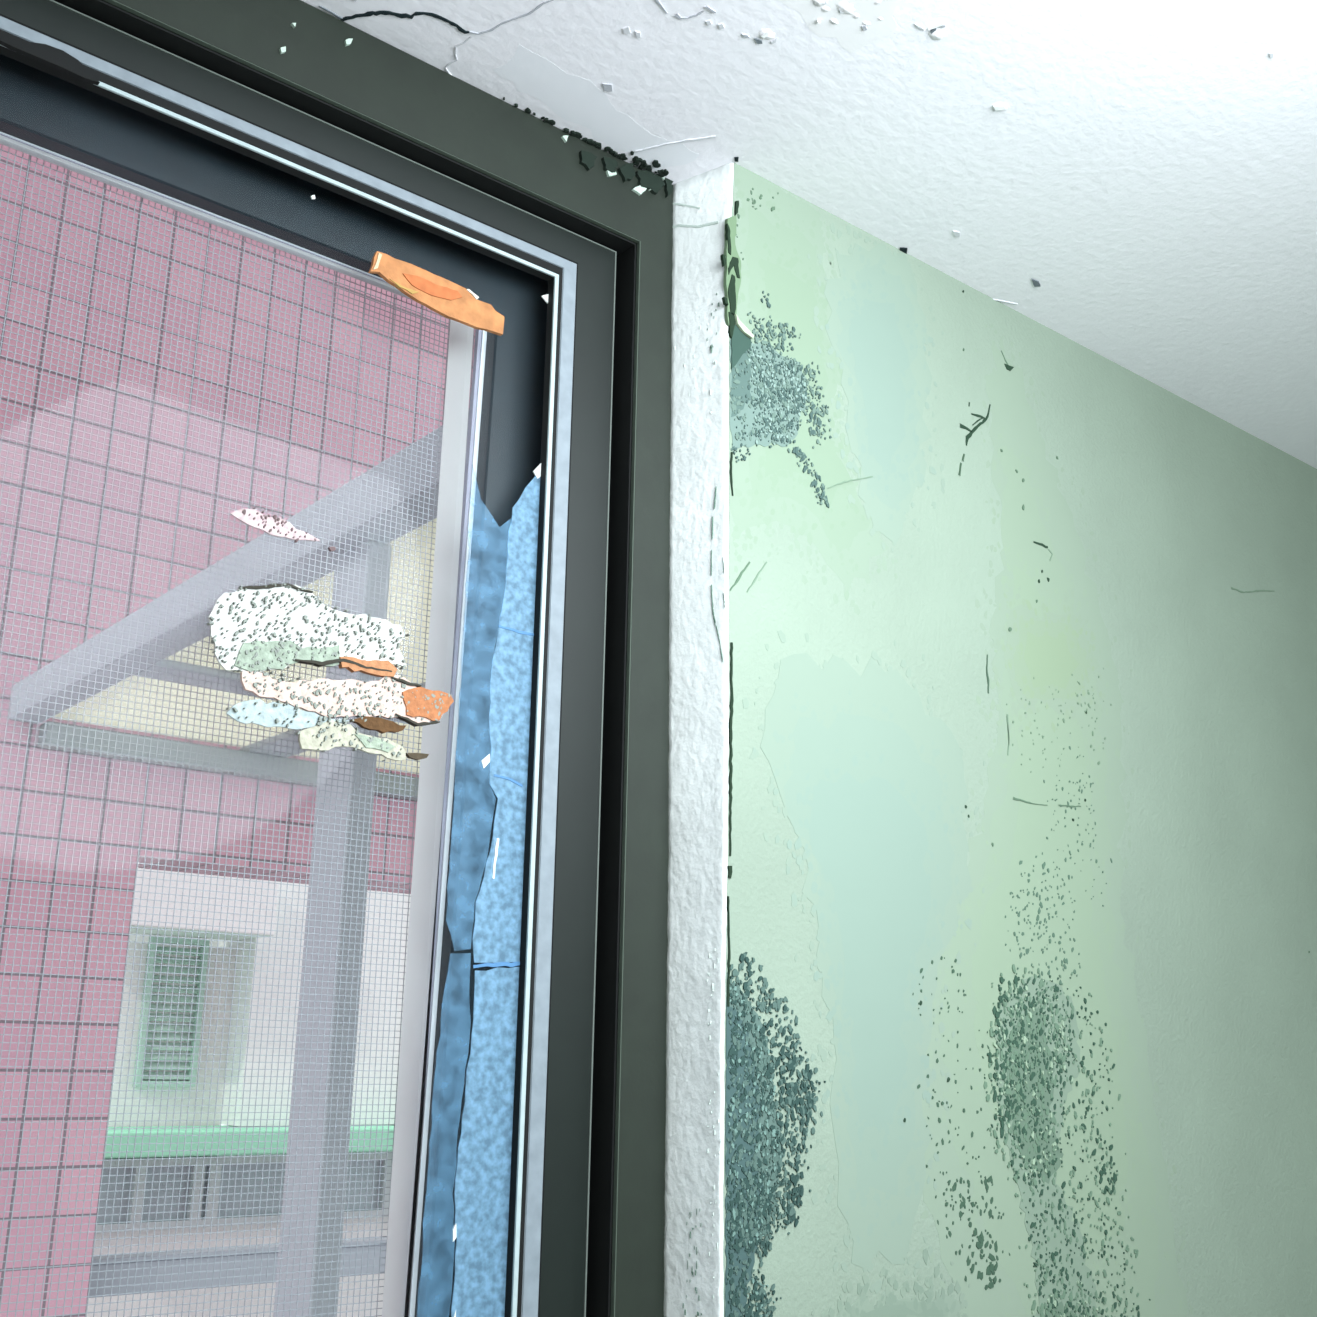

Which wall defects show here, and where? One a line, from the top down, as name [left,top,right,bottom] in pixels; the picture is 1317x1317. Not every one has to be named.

crack [319,0,553,76]
crack [655,0,704,20]
spalling [503,97,669,177]
leakage [707,165,945,615]
leakage [683,324,1193,1317]